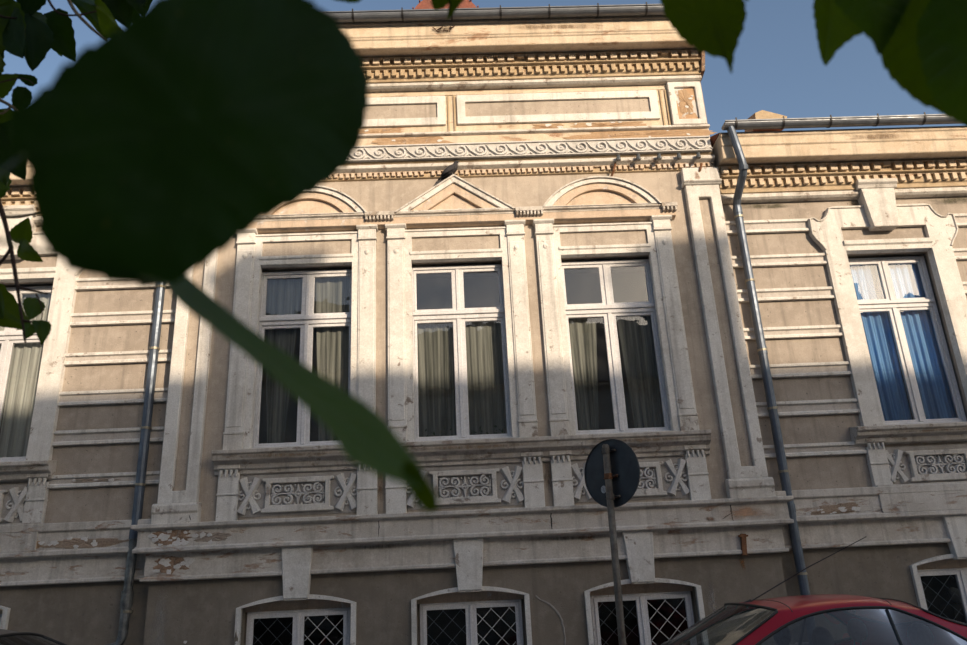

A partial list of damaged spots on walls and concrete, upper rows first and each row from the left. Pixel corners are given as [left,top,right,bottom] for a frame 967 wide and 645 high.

flaking render [678,89,693,115]
peeling [805,502,861,516]
peeling [36,537,129,549]
flaking render [147,529,231,574]